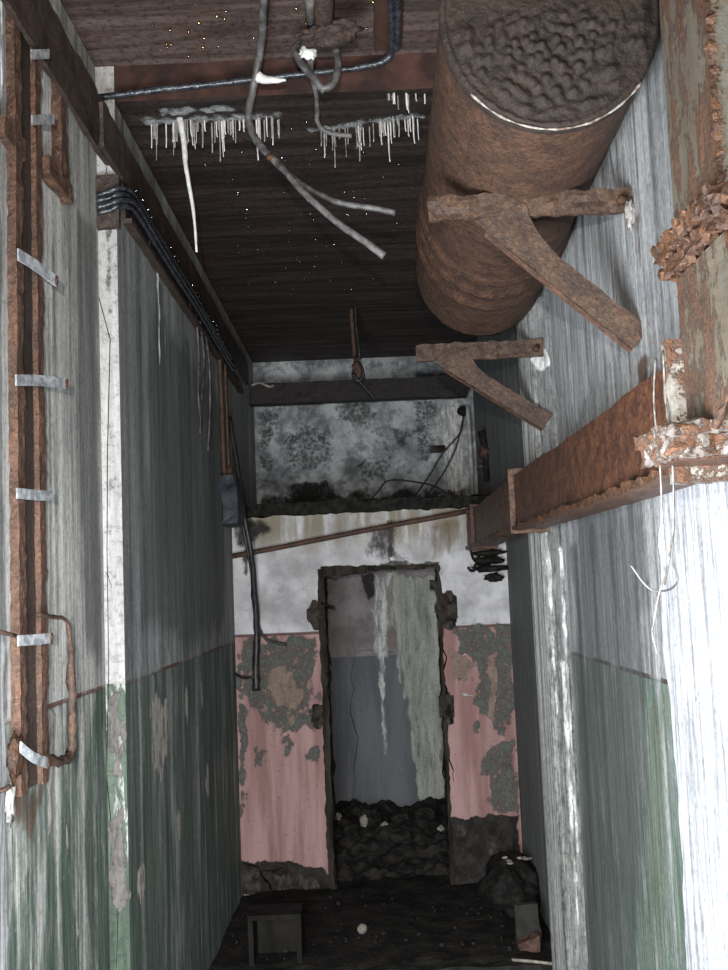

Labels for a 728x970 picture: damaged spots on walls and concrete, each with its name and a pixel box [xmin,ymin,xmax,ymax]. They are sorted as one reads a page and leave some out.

water stain [144,106,280,126]
water stain [308,115,424,132]
water stain [259,409,280,483]
water stain [285,425,331,468]
water stain [393,401,469,496]
corrosion [465,338,728,551]
water stain [289,481,334,503]
water stain [369,521,395,558]
peeling [236,600,325,817]
water stain [371,570,445,801]
peeling [324,557,520,885]